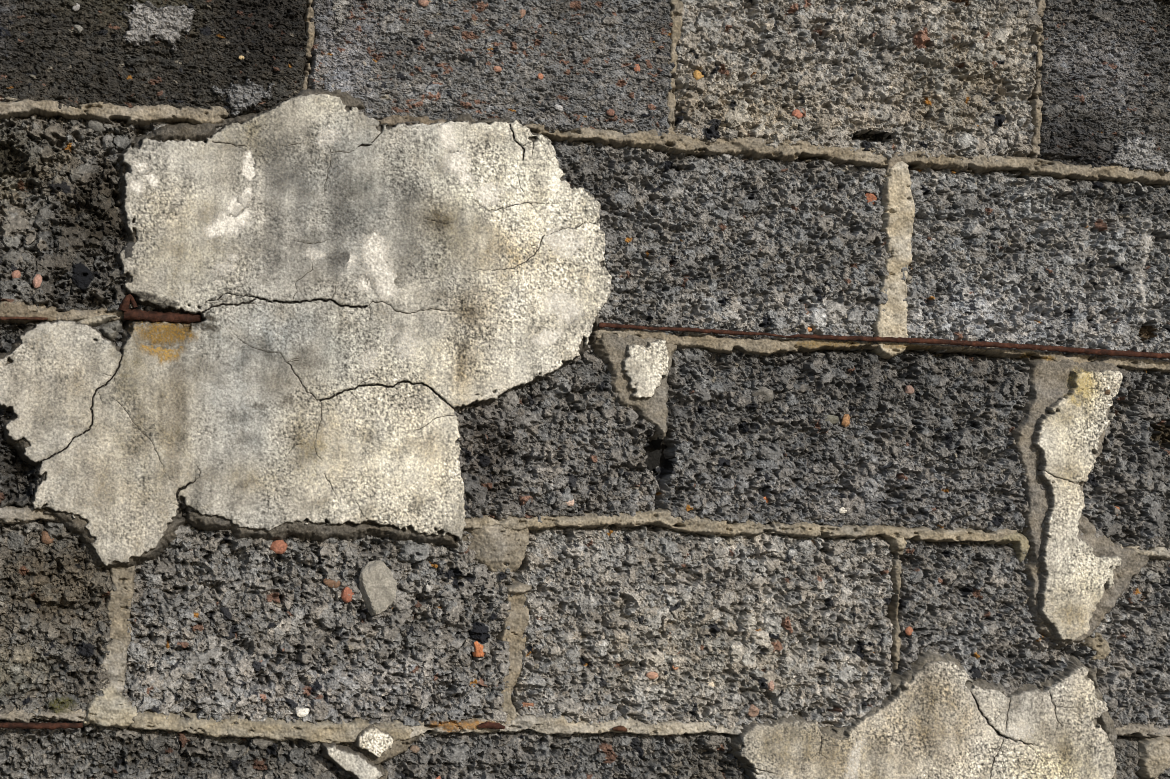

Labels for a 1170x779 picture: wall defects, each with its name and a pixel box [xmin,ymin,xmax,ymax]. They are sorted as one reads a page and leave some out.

crack [324,125,382,191]
spalling [852,130,901,143]
crack [457,124,599,274]
rust [118,294,201,363]
rust [598,322,1170,360]
spalling [1137,326,1158,343]
crack [202,239,462,519]
crack [40,354,201,514]
spalling [644,434,676,477]
rust [0,722,83,730]
flaking render [320,724,393,779]
crack [971,685,1074,779]